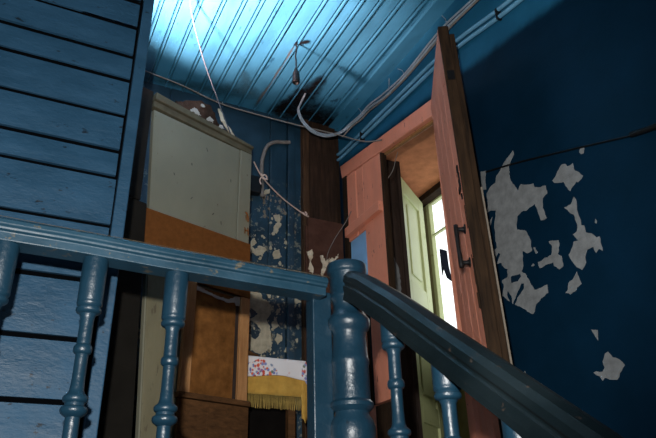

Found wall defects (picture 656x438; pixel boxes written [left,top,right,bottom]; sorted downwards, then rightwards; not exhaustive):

peeling [250,189,287,267]
peeling [480,151,548,314]
peeling [531,163,603,294]
peeling [248,292,286,358]
peeling [594,352,625,381]